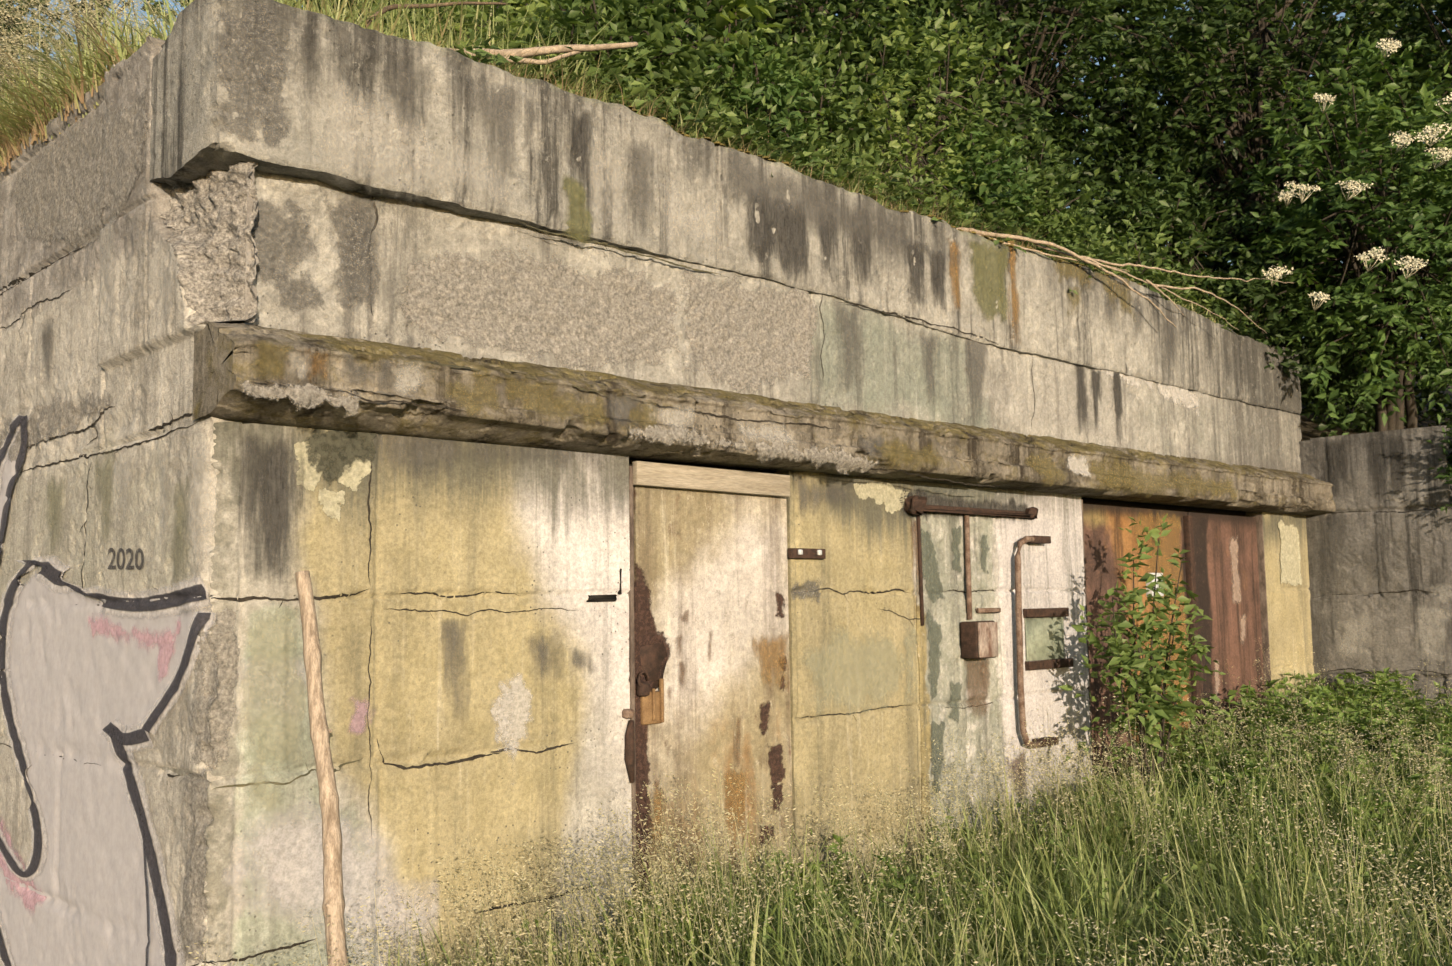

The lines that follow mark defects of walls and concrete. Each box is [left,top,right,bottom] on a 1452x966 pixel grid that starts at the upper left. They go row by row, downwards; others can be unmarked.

crack [0,242,92,343]
spalling [160,162,380,325]
spalling [396,247,819,394]
water stain [731,160,945,304]
water stain [240,436,301,576]
peeling [240,380,376,522]
spalling [629,425,910,514]
crack [167,459,575,841]
crack [816,581,995,625]
corrosion [1131,514,1187,686]
corrosion [629,564,670,898]
corrosion [753,639,787,847]